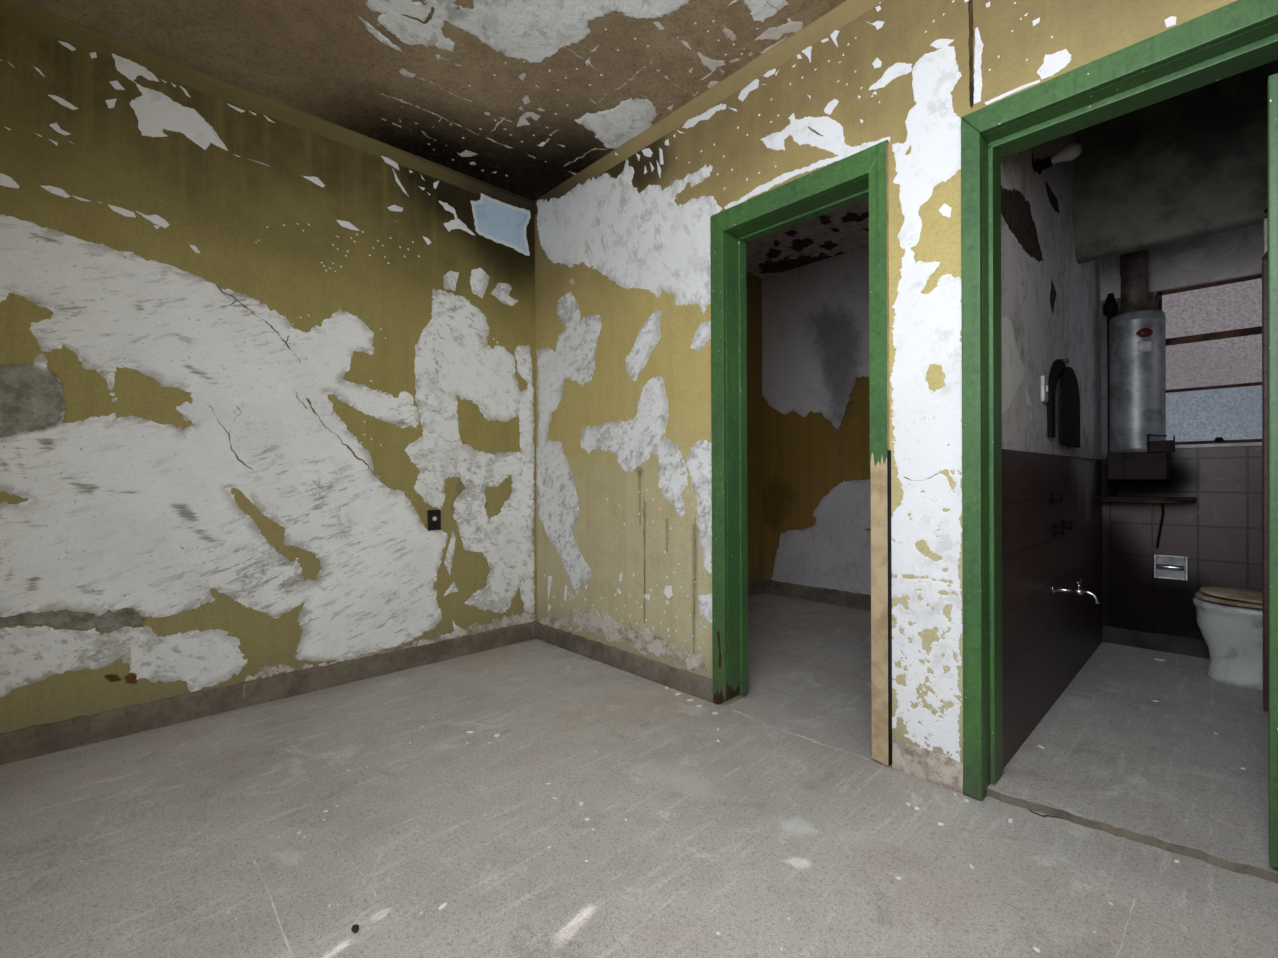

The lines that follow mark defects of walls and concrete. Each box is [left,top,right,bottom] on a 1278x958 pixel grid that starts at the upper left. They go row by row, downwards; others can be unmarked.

peeling [105,54,268,166]
peeling [356,14,402,52]
peeling [505,87,546,148]
peeling [636,30,840,177]
peeling [681,18,803,97]
peeling [41,185,170,229]
peeling [381,156,531,256]
peeling [443,268,519,306]
crack [209,405,253,470]
crack [216,285,381,480]
peeling [724,27,1072,762]
flaking render [245,576,722,681]